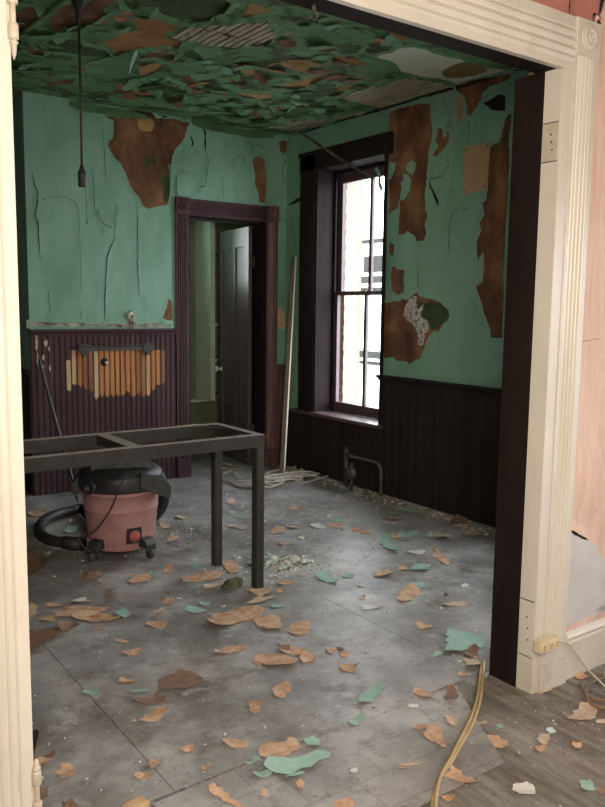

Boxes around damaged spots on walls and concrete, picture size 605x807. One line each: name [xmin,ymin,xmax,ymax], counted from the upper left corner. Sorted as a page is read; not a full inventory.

crack [32,118,120,320]
peeling [11,0,515,371]
peeling [66,349,165,399]
flaking render [566,533,605,631]
peeling [208,783,244,807]
peeling [444,765,476,783]